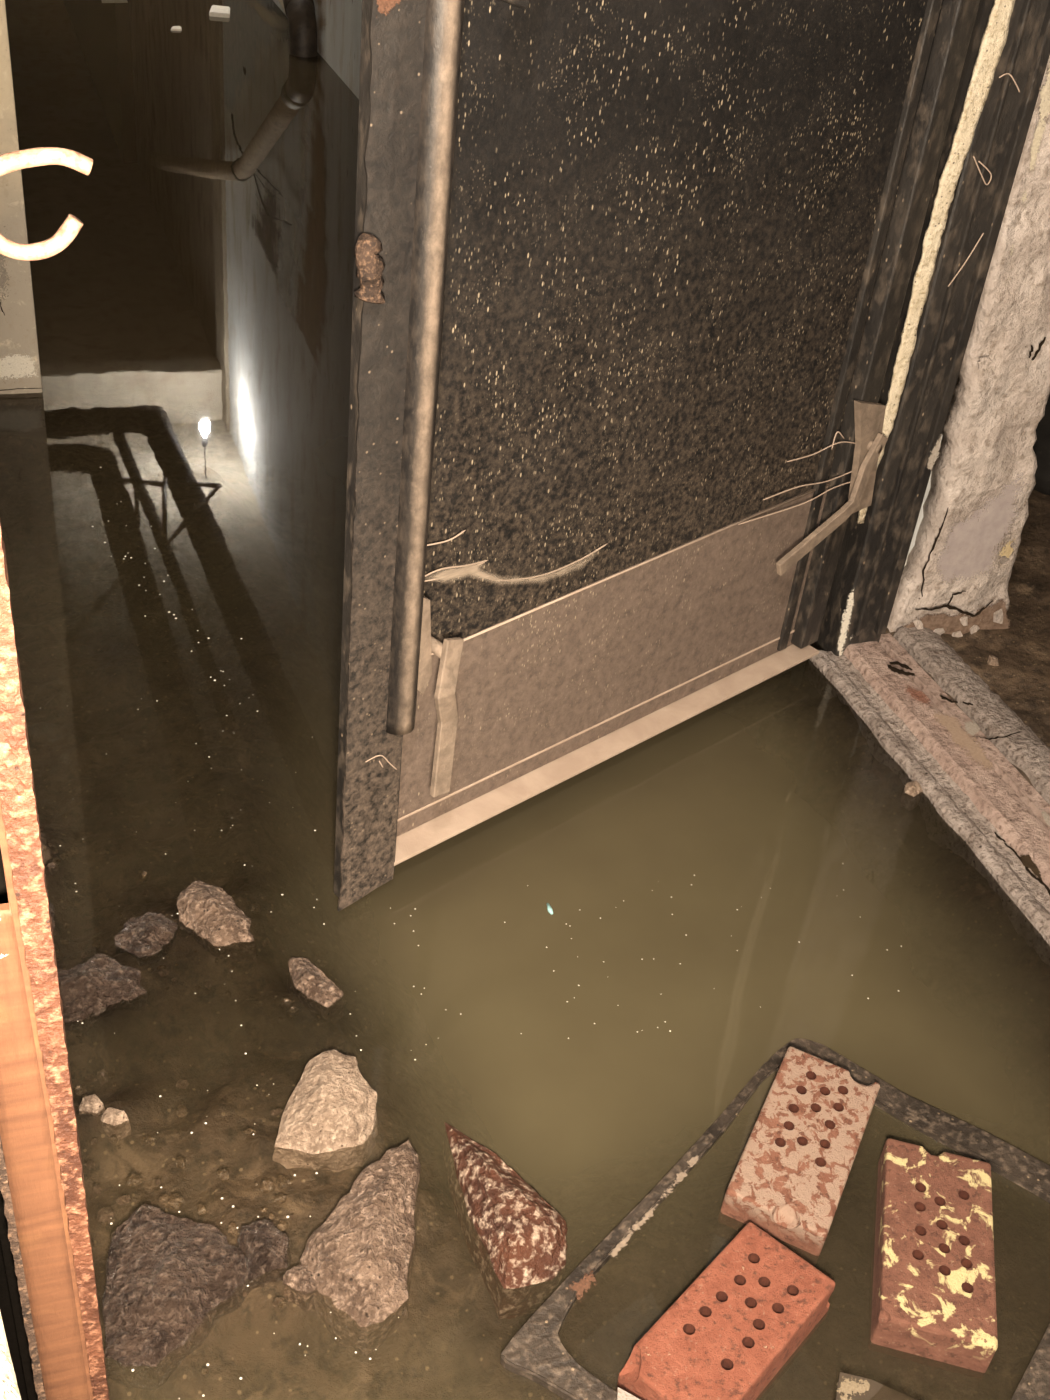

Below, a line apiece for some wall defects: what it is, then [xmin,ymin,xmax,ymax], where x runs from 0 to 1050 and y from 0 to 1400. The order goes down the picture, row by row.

rust [376,0,401,16]
spalling [1020,63,1050,202]
peeling [927,434,941,470]
spalling [999,539,1017,565]
spalling [904,599,1010,637]